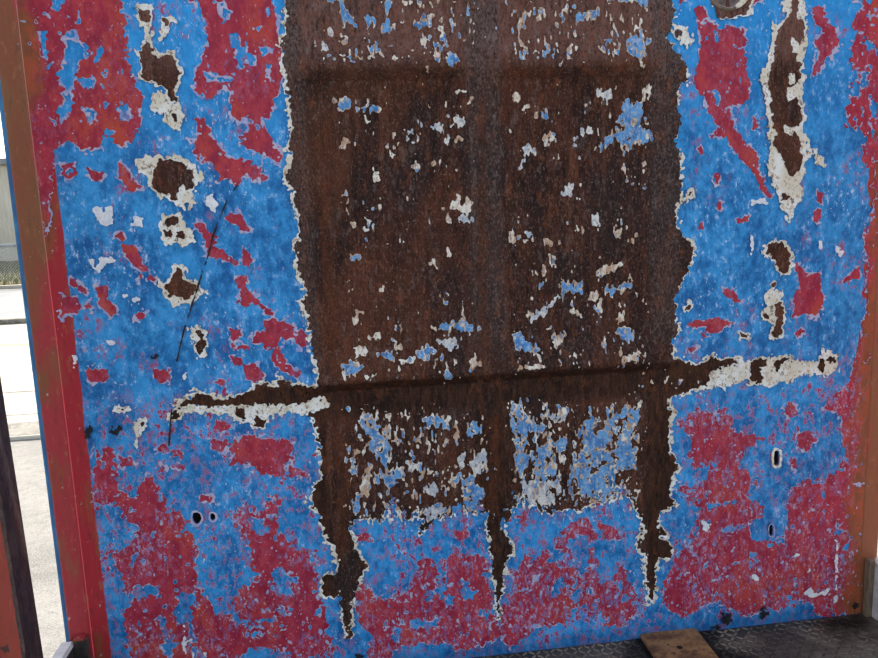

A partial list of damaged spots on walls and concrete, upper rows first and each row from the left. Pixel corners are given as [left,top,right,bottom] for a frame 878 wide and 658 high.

rust [134,3,187,131]
rust [135,153,204,248]
peeling [184,0,284,186]
peeling [314,0,479,85]
peeling [505,0,652,68]
peeling [573,84,653,190]
rust [154,264,209,308]
peeling [192,218,309,387]
rust [166,0,840,639]
peeling [660,0,878,620]
rust [112,404,147,449]
peeling [341,212,690,658]